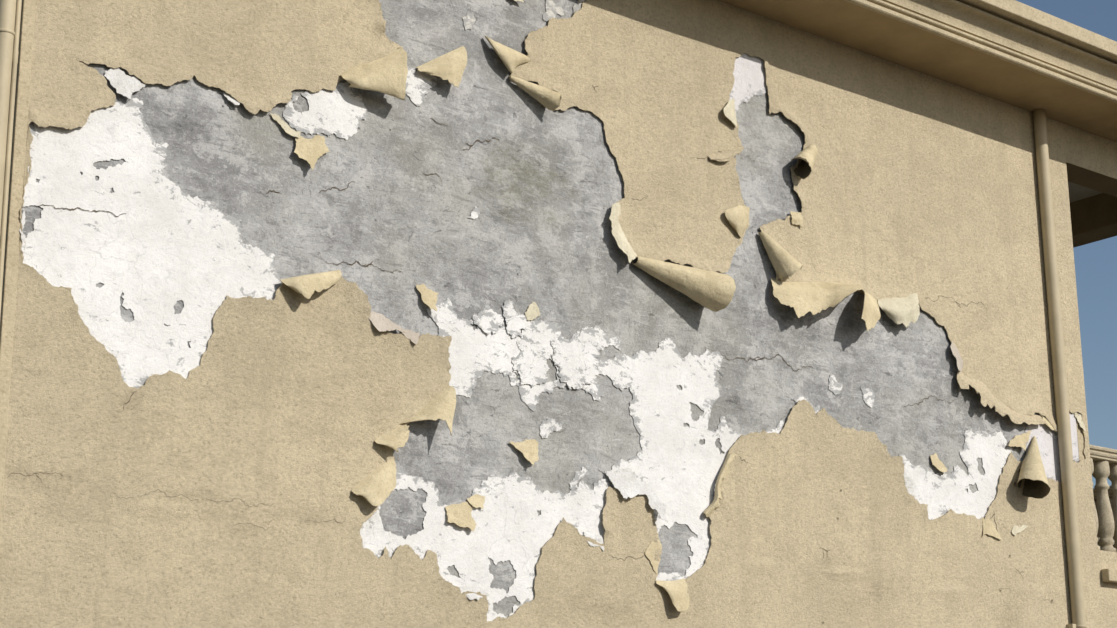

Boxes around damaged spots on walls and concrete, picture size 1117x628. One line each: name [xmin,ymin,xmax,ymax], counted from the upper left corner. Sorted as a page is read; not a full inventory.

peeling [19,61,282,388]
peeling [131,0,1061,540]
peeling [352,297,667,621]
peeling [596,337,743,611]